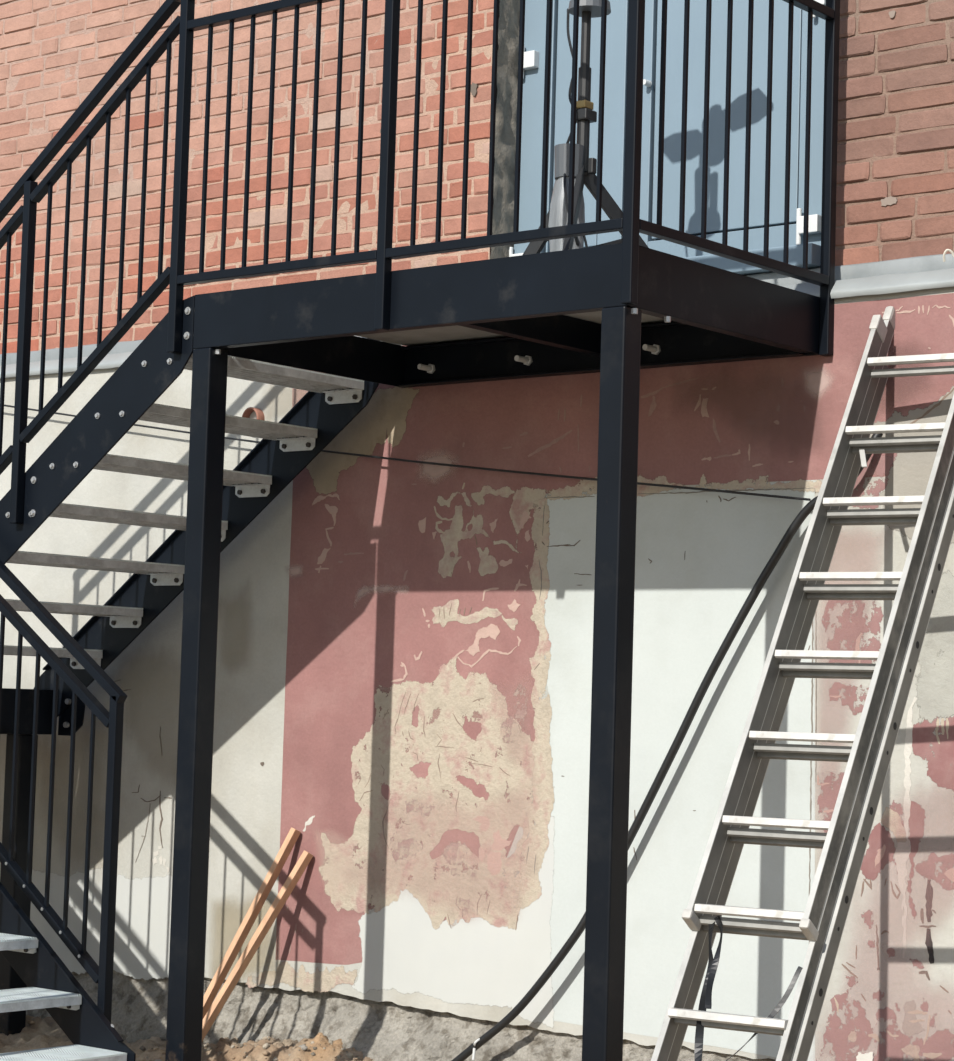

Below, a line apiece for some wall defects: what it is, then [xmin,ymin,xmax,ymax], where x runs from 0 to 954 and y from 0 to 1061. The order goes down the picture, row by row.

peeling [306,386,420,573]
peeling [637,474,822,497]
peeling [319,477,597,930]
peeling [875,844,886,866]